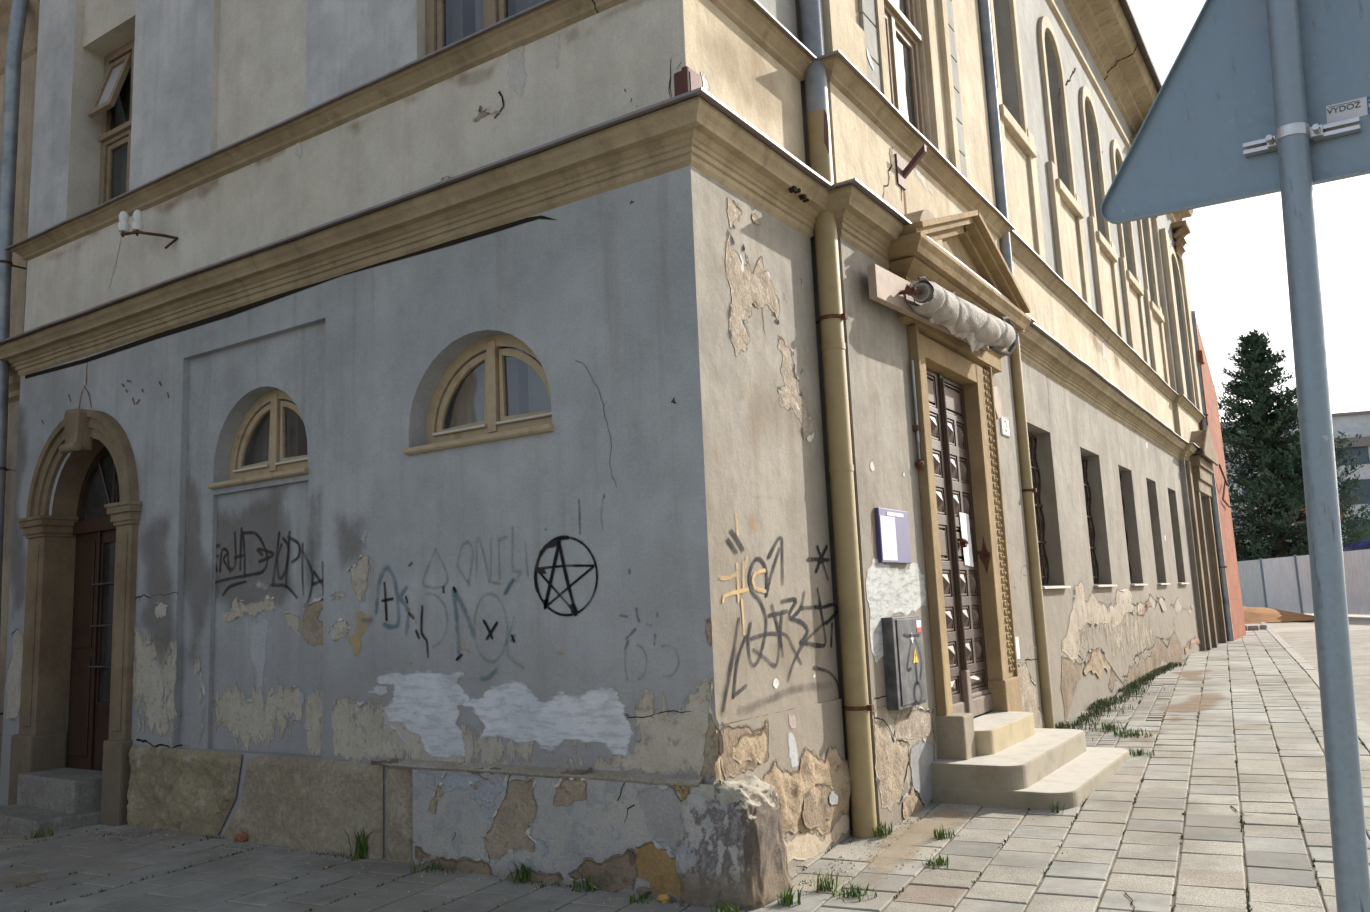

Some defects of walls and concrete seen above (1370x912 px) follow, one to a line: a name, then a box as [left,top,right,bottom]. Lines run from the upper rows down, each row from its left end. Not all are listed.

crack [575,360,617,488]
peeling [133,601,177,743]
spalling [223,530,374,646]
spalling [704,617,712,647]
spalling [1061,581,1201,721]
peeling [213,676,852,897]
spalling [872,704,938,820]